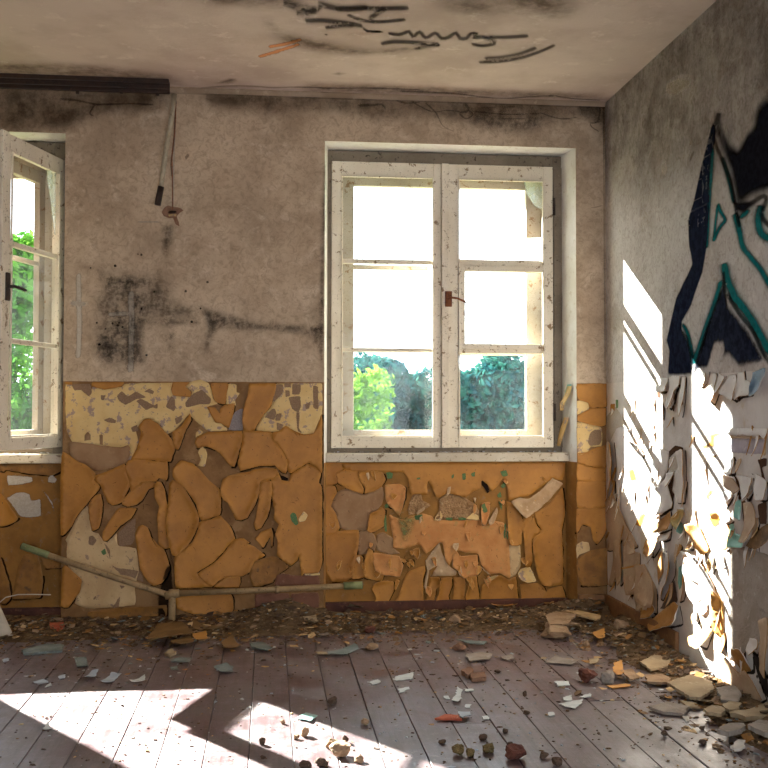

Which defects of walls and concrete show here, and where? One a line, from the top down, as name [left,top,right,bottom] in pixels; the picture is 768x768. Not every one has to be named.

damp [96,281,177,372]
damp [200,308,262,333]
peeling [700,368,766,406]
peeling [0,380,566,618]
peeling [554,376,768,704]